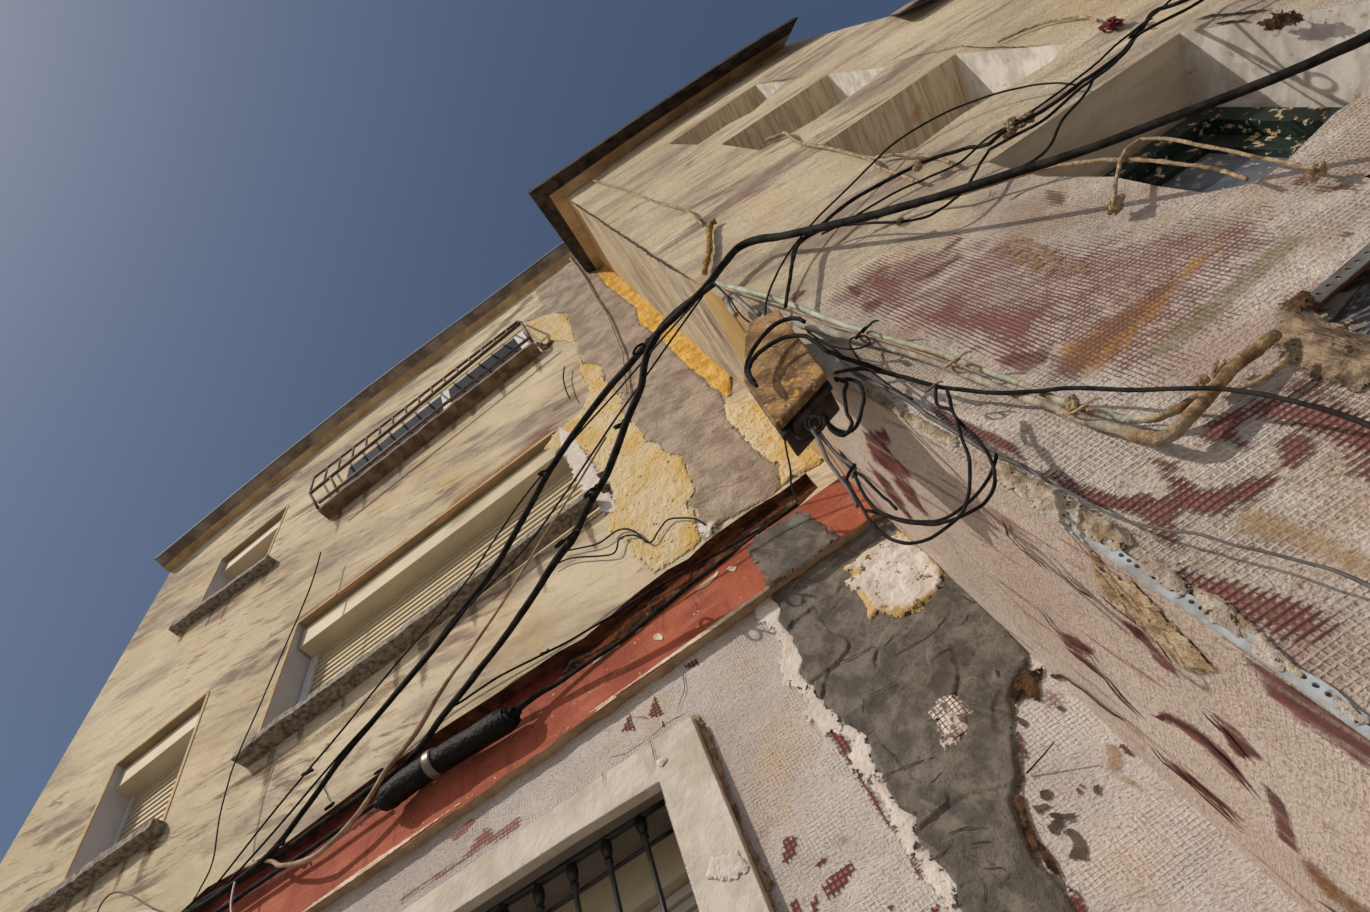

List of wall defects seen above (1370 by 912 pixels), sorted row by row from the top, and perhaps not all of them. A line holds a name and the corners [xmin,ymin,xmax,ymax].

flaking render [1256,8,1306,32]
peeling [1045,190,1066,207]
peeling [1291,173,1359,194]
flaking render [1277,290,1315,312]
peeling [525,266,822,677]
flaking render [842,531,945,620]
flaking render [595,586,959,912]
peeling [925,692,976,751]
flaking render [1010,666,1046,710]
flaking render [1326,689,1369,725]
peeling [302,794,473,912]
flaking render [1013,786,1073,893]